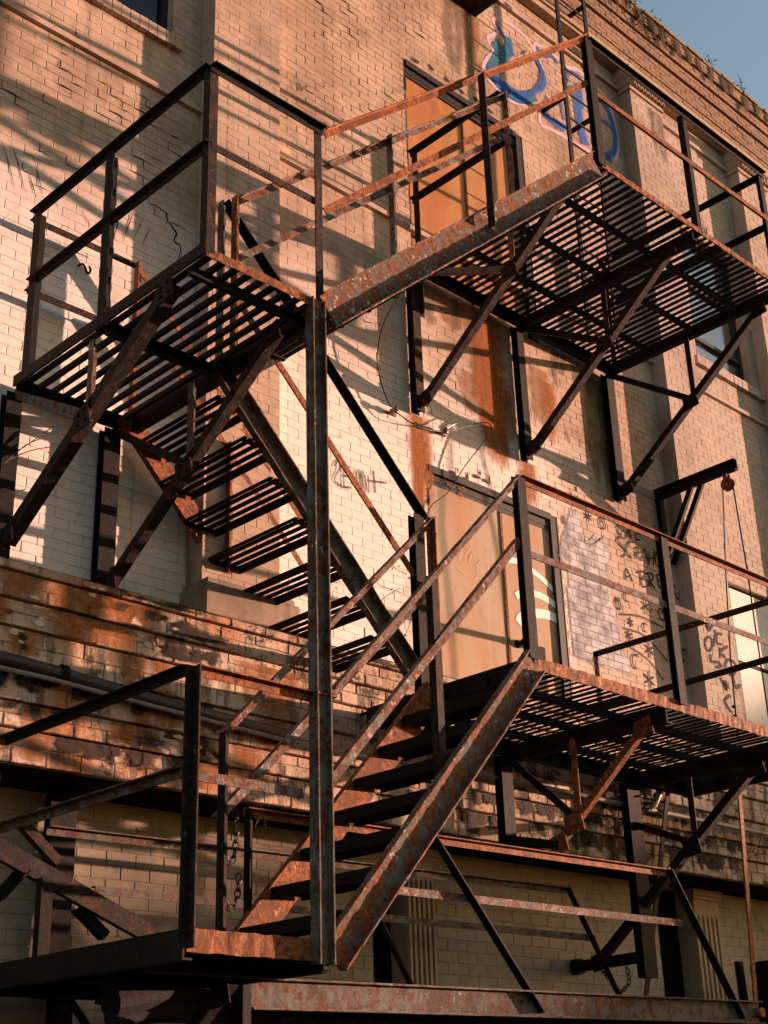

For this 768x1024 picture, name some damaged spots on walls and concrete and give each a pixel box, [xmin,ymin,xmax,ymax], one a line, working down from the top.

crack [1,30,184,259]
rust [474,306,509,466]
rust [412,415,427,522]
spalling [9,628,28,650]
peeling [131,615,161,651]
water stain [457,791,498,834]
water stain [517,791,626,856]
water stain [641,792,742,873]